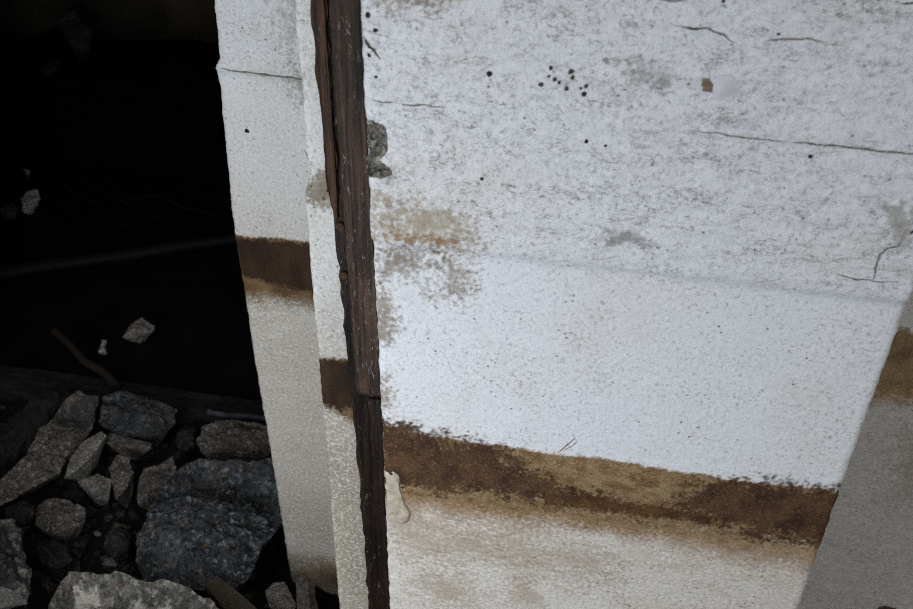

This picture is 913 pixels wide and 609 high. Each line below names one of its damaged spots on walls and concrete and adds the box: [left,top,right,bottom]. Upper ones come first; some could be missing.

water stain [235,235,314,306]
water stain [319,358,353,423]
water stain [873,327,913,405]
water stain [382,418,842,563]